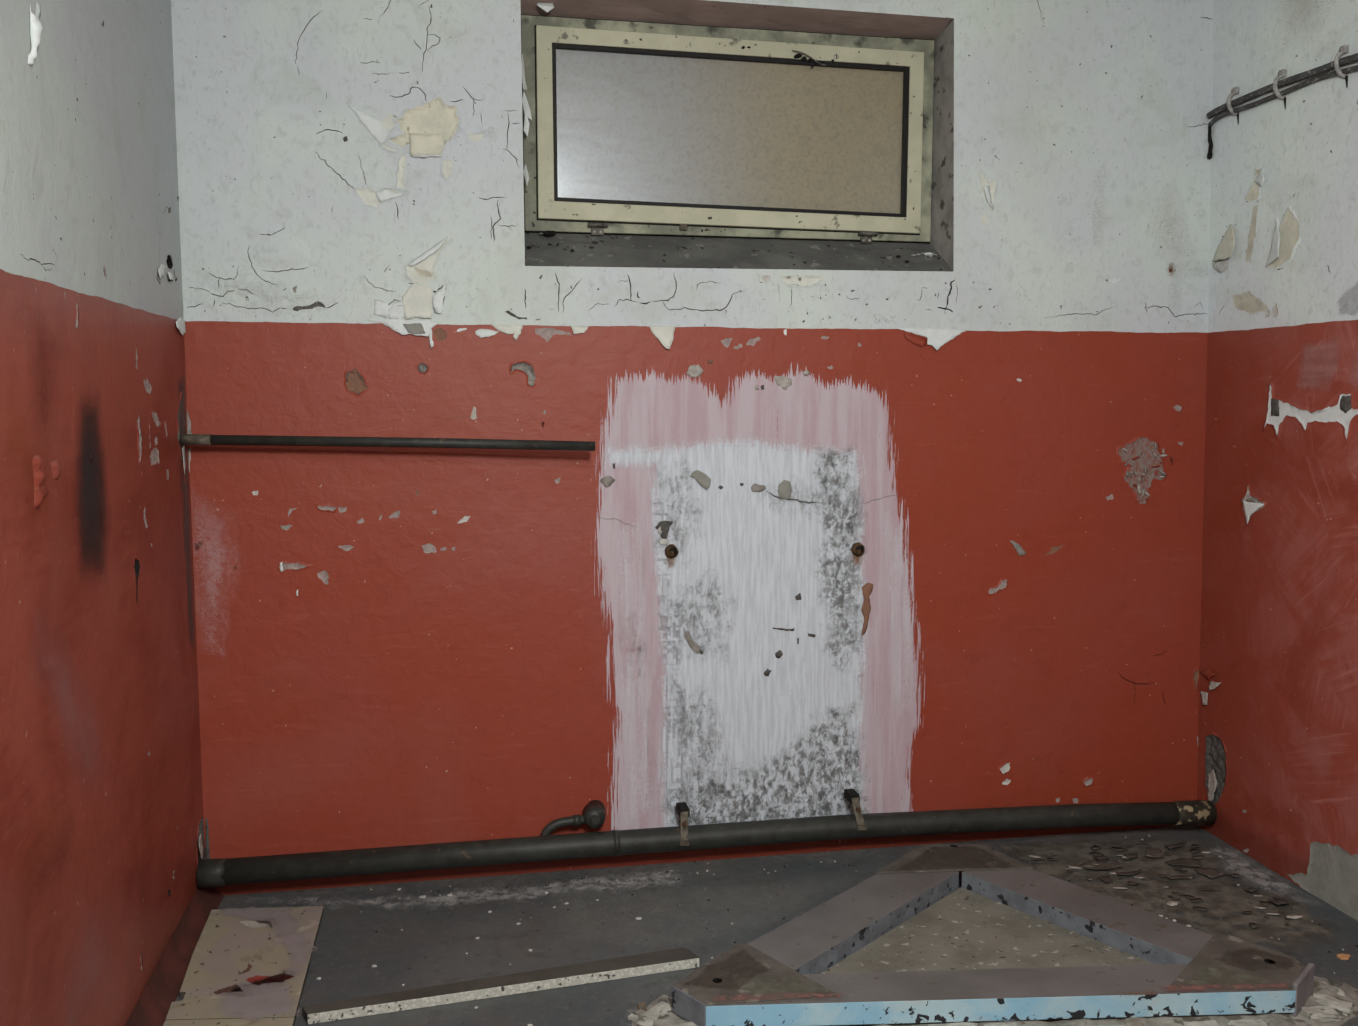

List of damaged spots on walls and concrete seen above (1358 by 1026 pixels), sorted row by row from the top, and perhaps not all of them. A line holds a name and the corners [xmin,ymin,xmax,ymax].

peeling [27,3,42,71]
crack [361,0,519,166]
crack [316,92,348,142]
crack [480,197,515,240]
crack [180,228,337,315]
crack [524,274,742,313]
crack [920,280,958,312]
peeling [649,326,676,349]
peeling [897,327,967,350]
peeling [1262,381,1358,445]
peeling [1116,435,1183,507]
peeling [861,583,873,636]